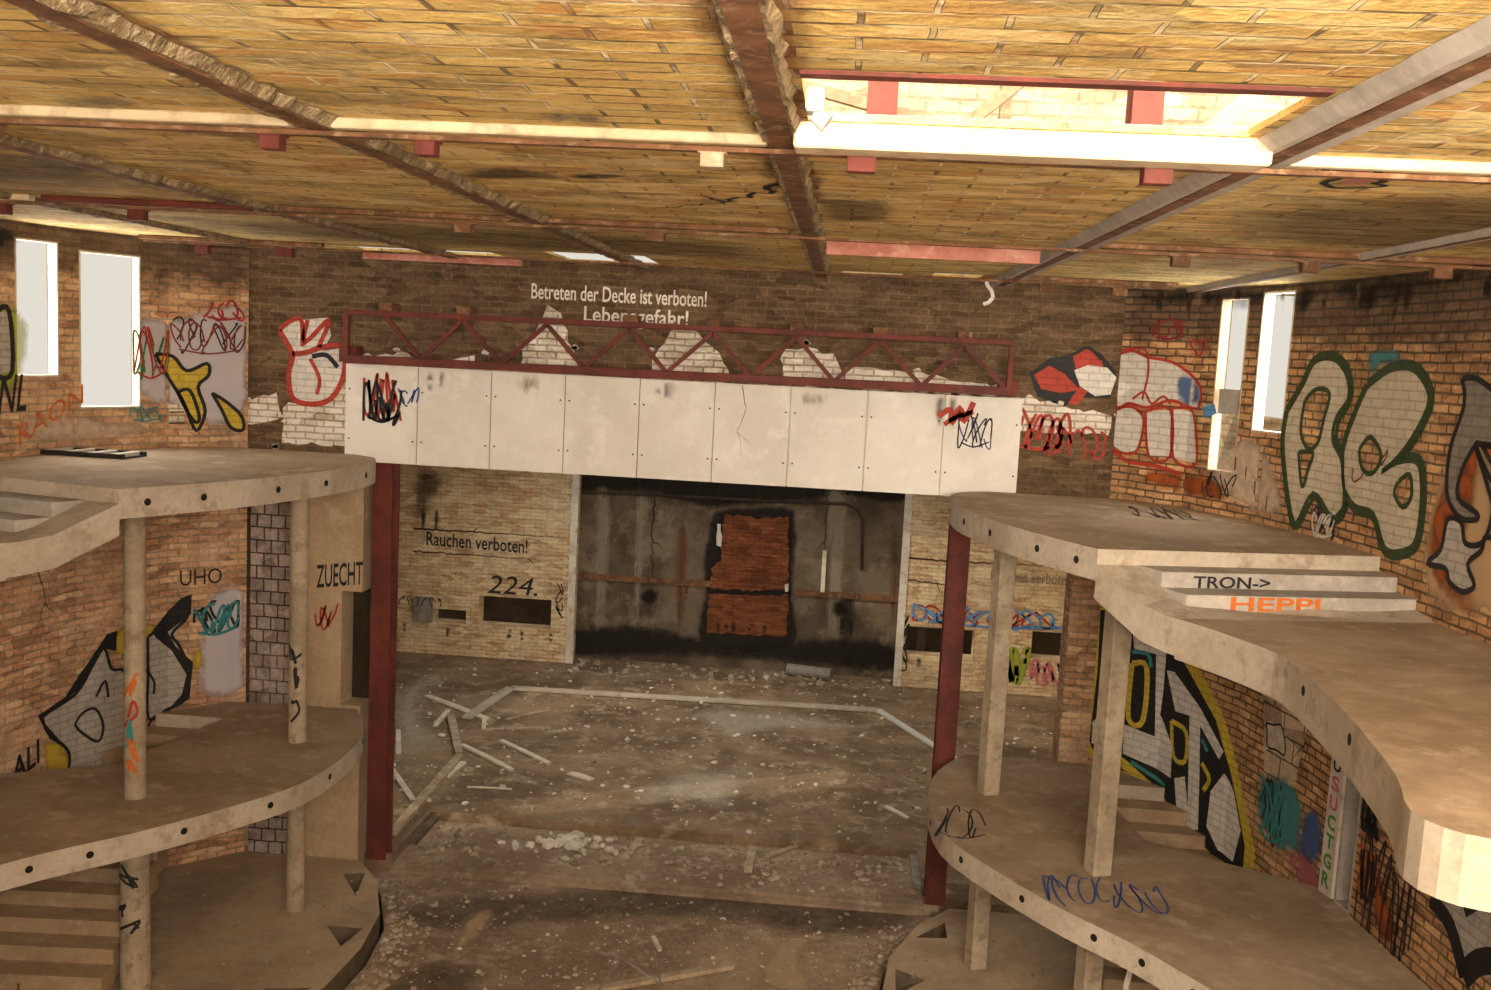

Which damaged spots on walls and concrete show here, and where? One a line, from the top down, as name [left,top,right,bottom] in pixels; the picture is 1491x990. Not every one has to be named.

damp [0,229,16,246]
damp [418,475,439,529]
damp [575,474,905,670]